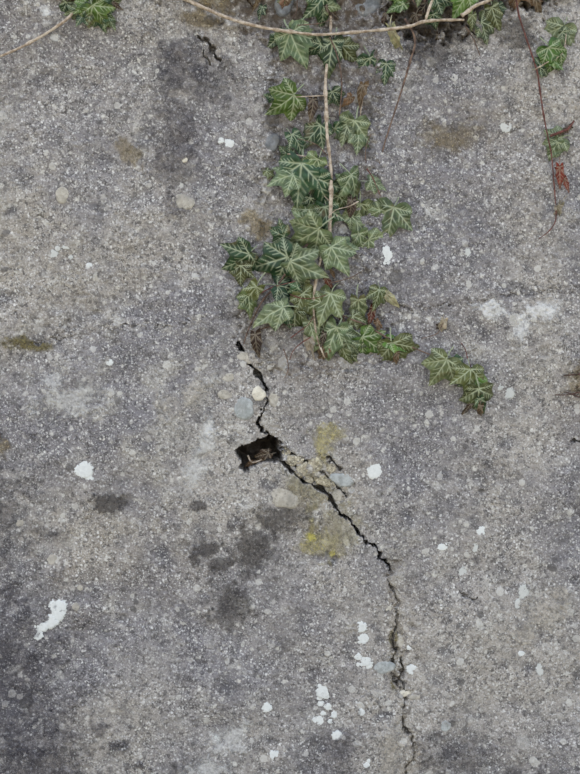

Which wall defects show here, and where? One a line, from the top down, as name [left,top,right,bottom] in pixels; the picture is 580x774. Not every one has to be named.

crack [107,313,247,332]
crack [8,333,78,347]
crack [235,339,416,774]